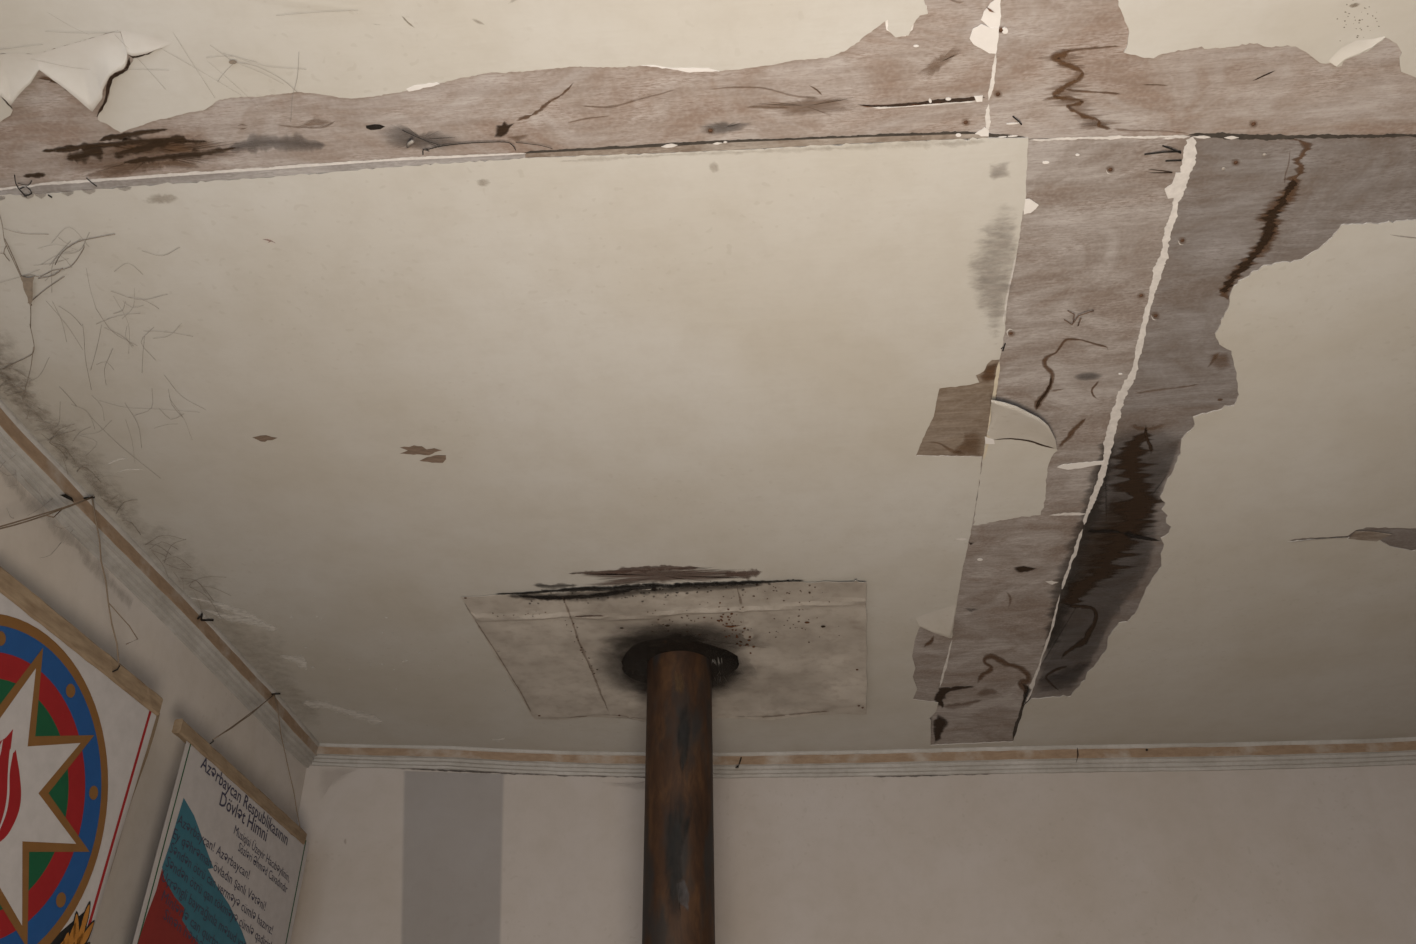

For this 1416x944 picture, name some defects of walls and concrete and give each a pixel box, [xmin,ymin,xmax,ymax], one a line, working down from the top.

leakage [43,129,235,164]
peeling [0,0,1416,745]
leakage [1060,419,1085,445]
leakage [536,565,698,587]
leakage [725,571,759,579]
leakage [934,429,1164,741]